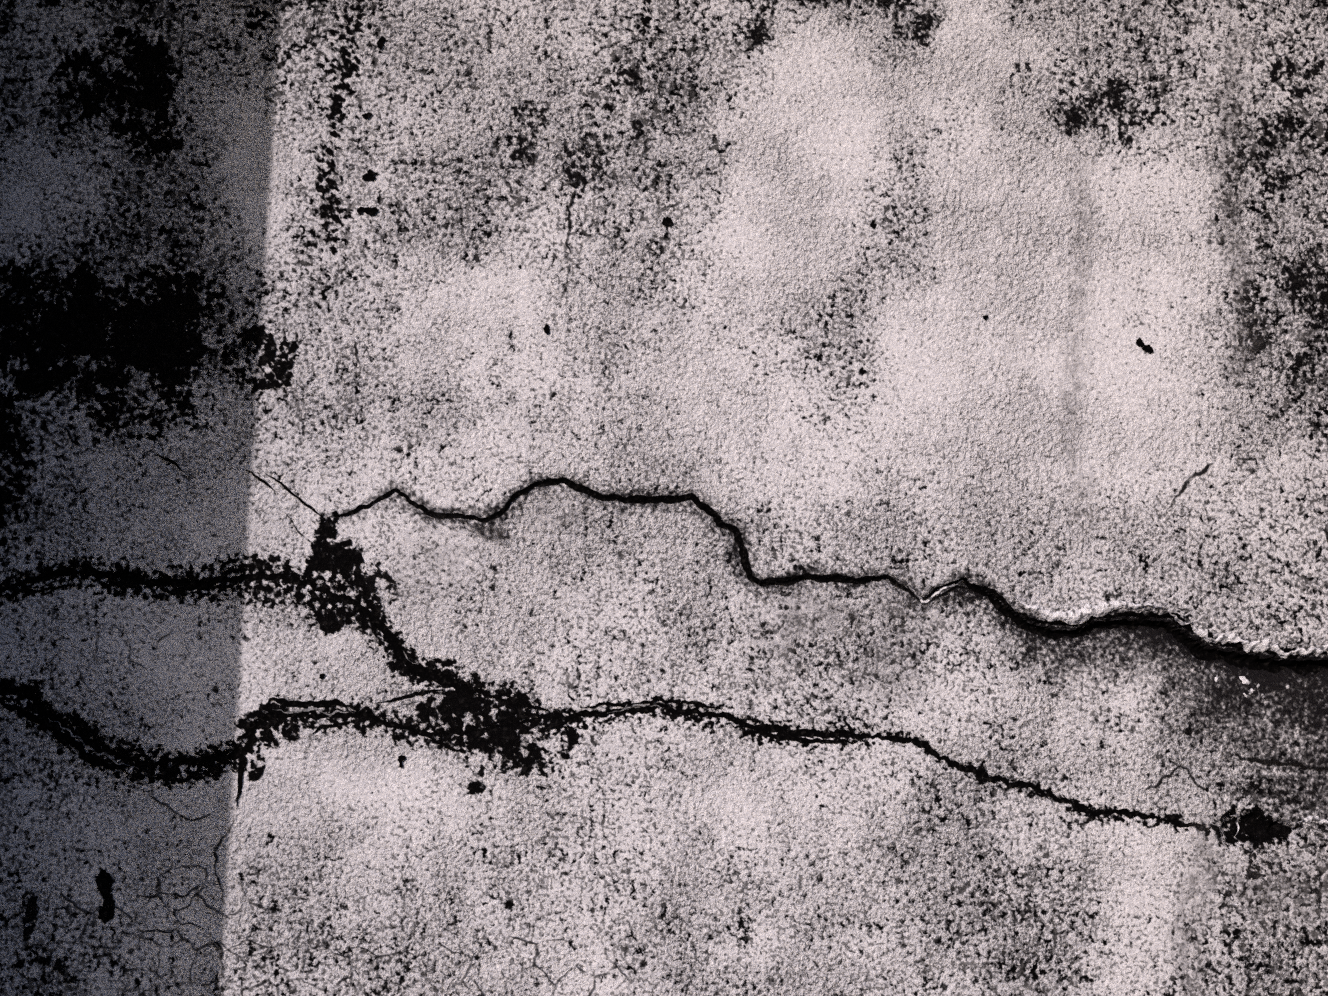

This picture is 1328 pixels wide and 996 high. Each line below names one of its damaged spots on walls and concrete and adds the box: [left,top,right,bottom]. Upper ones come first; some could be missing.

mould [0,251,298,546]
crack [150,454,185,473]
crack [0,468,1328,996]